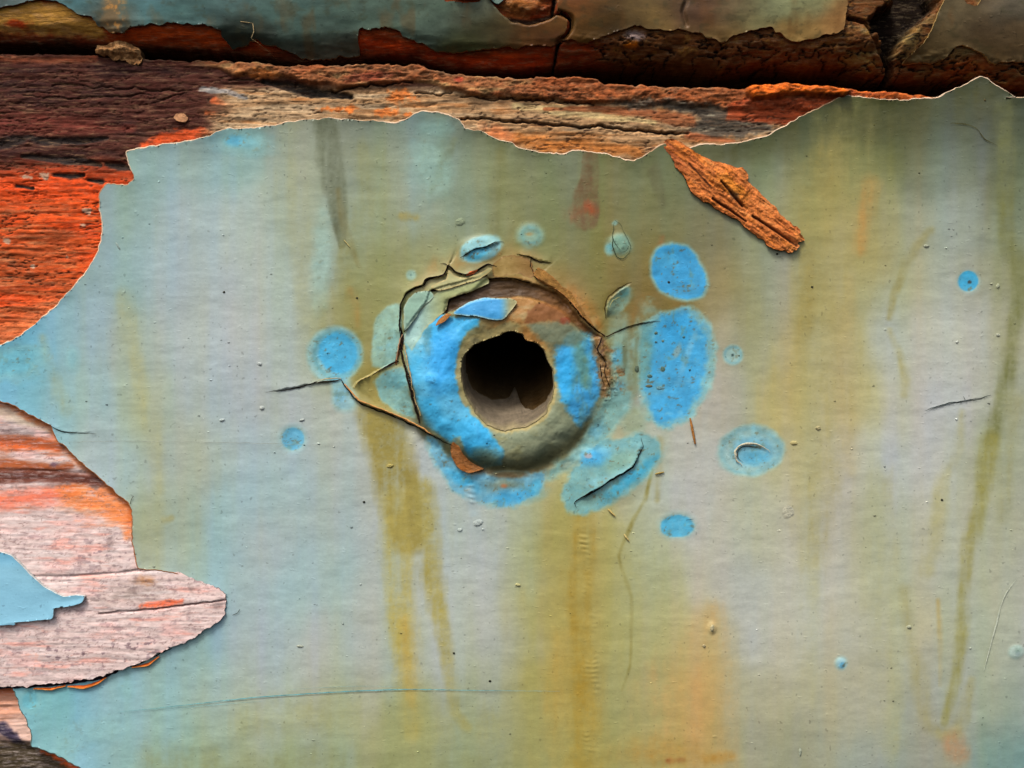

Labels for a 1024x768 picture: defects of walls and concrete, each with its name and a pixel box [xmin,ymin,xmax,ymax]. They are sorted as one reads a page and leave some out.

peeling [0,54,1024,345]
peeling [0,401,227,768]
corrosion [350,356,463,696]
peeling [368,268,517,421]
crack [270,220,659,445]
corrosion [450,442,484,473]
peeling [422,300,665,512]
crack [574,439,643,506]
crack [925,395,990,411]